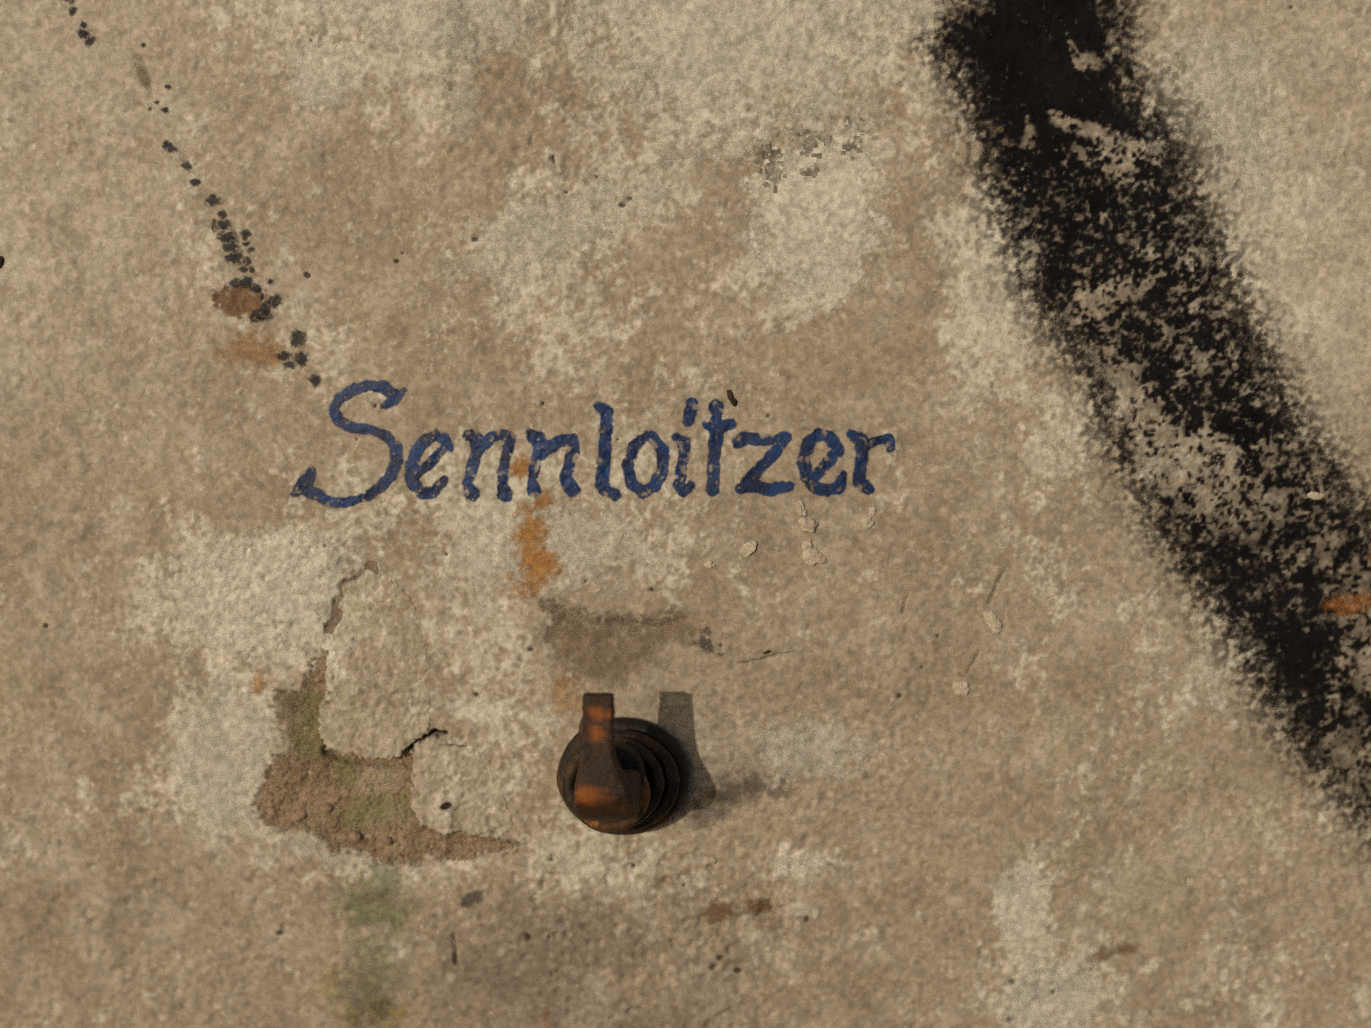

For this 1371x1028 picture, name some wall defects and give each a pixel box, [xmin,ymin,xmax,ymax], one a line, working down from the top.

rust [514,495,561,596]
spalling [250,574,517,867]